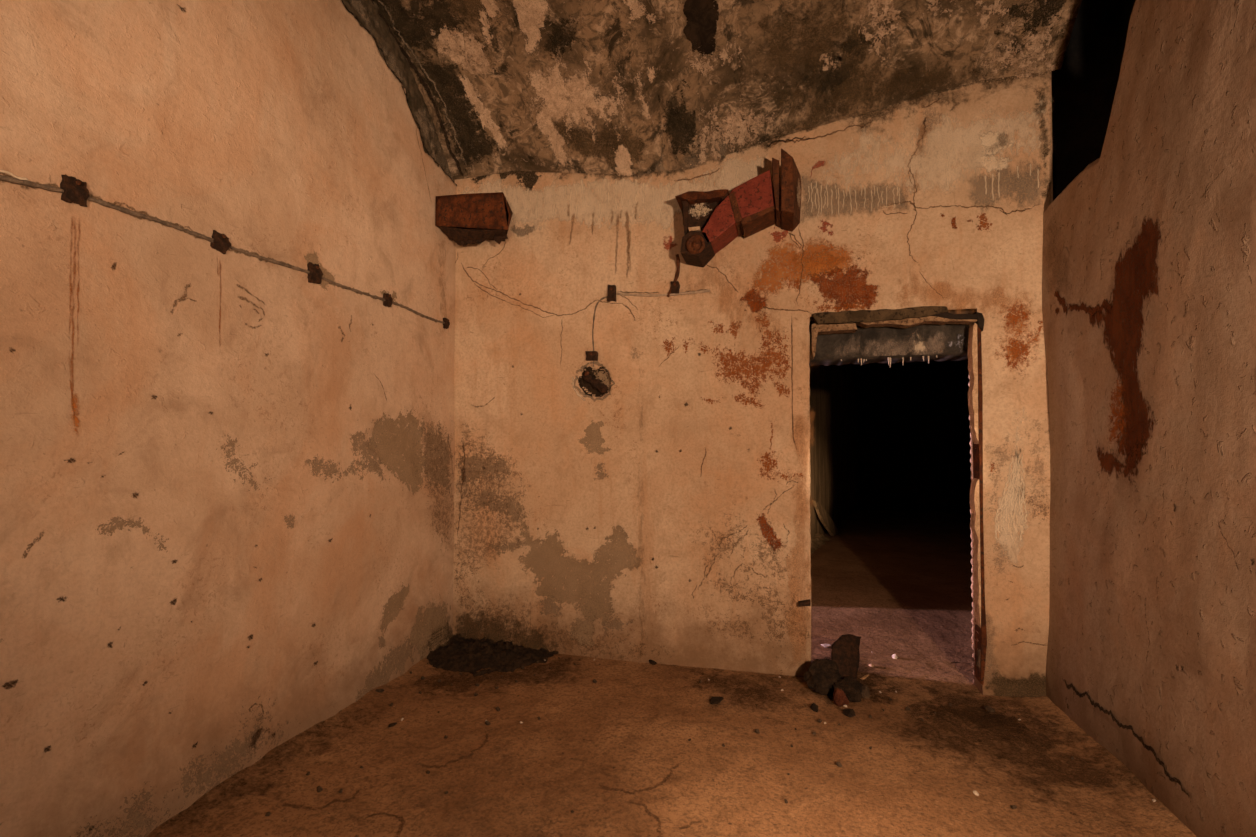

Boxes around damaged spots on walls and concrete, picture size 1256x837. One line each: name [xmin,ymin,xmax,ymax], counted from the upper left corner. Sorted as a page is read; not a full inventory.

leakage [993,0,1066,36]
leakage [373,0,1050,275]
crack [767,122,871,147]
crack [883,100,1030,296]
corrosion [69,224,80,432]
corrosion [662,239,878,409]
corrosion [996,302,1044,372]
corrosion [1054,217,1162,482]
flaking render [305,407,658,646]
corrosion [693,513,786,579]
flaking render [355,584,451,701]